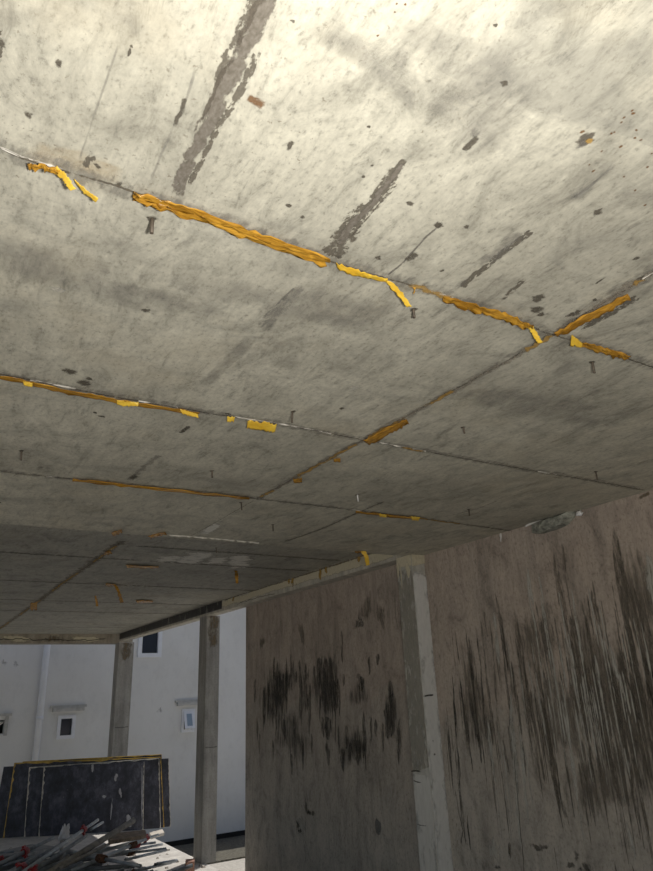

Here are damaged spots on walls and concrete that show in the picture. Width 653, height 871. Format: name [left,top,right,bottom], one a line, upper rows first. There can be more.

damp [208,616,219,645]
damp [222,531,653,871]